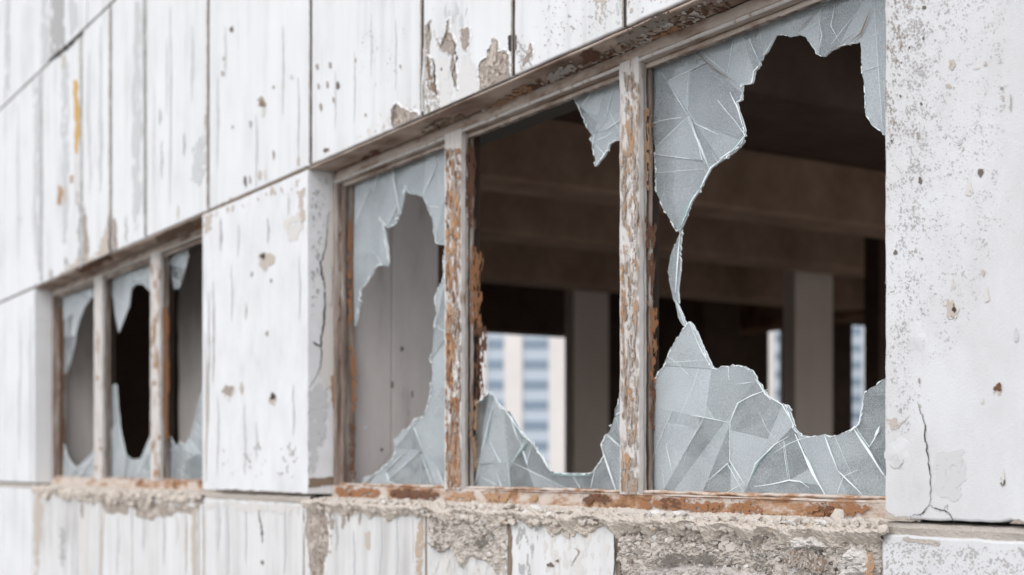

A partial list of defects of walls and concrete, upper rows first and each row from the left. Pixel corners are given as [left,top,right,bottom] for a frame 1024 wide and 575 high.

peeling [390,16,472,128]
peeling [477,33,535,89]
rust [421,2,731,135]
crack [309,213,329,387]
rust [331,72,872,575]
spalling [102,497,195,521]
spalling [304,499,524,575]
spalling [540,509,883,575]
crack [909,402,955,524]